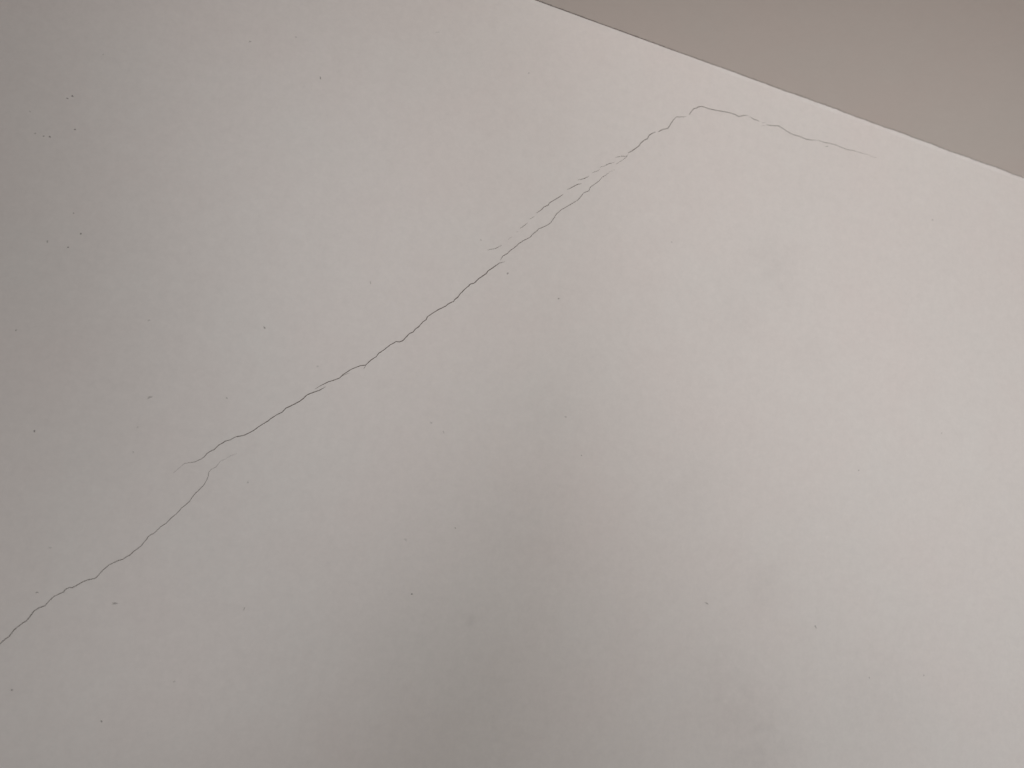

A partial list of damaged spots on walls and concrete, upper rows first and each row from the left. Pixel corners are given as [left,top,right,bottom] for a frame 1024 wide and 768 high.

crack [0,106,864,644]